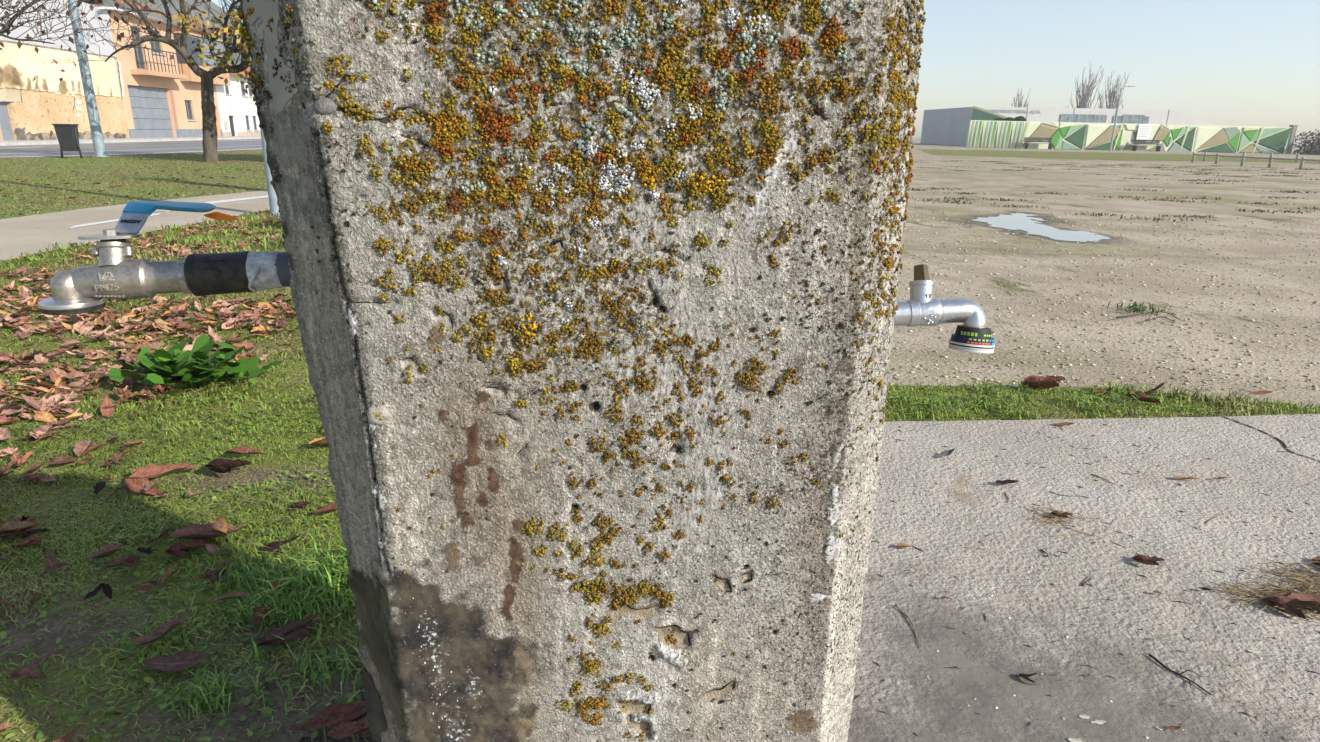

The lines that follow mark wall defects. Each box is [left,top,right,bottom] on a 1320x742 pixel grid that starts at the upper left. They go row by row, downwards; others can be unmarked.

corrosion [452,422,500,528]
crack [1223,416,1320,461]
corrosion [445,542,487,572]
corrosion [502,519,527,621]
leakage [346,534,539,742]